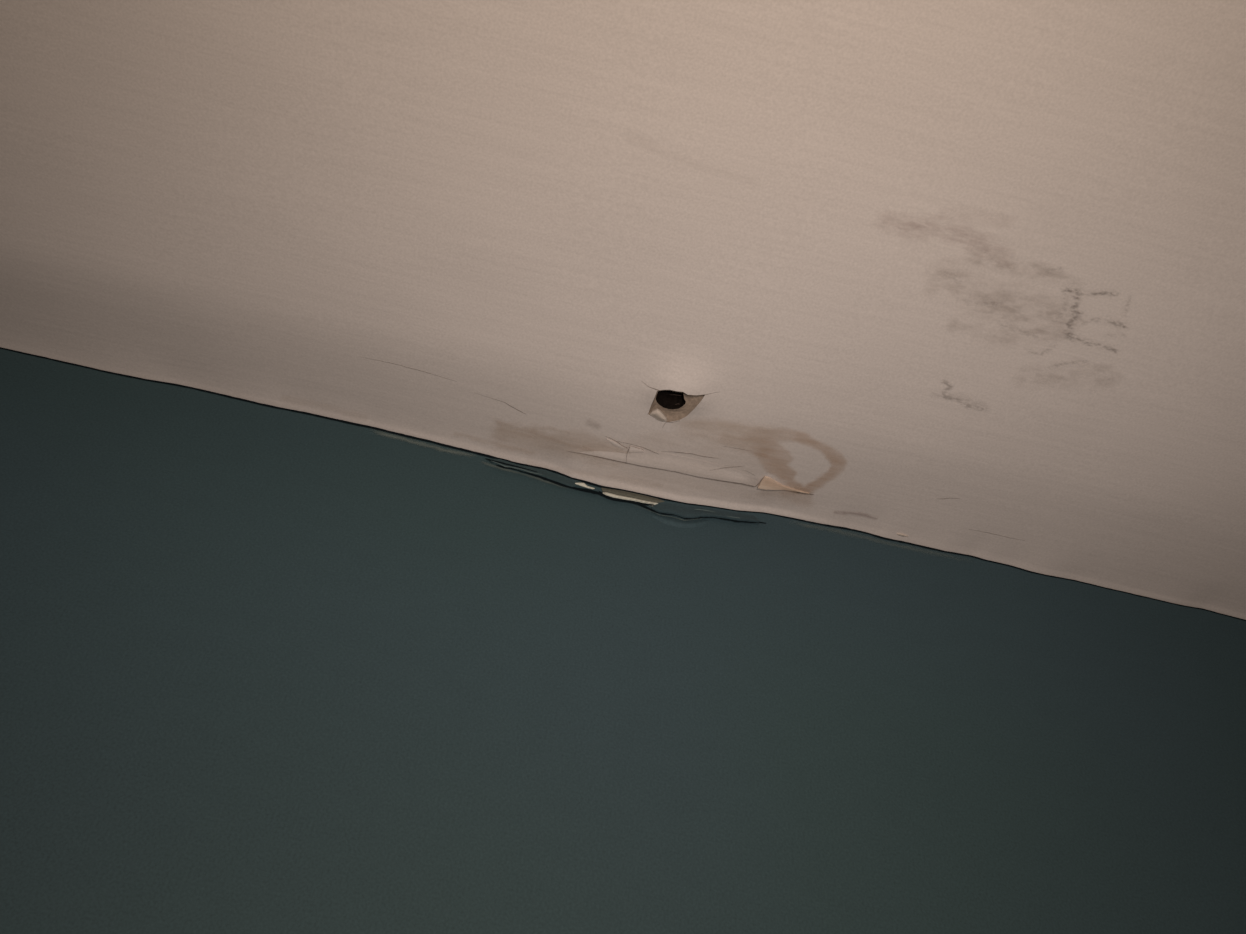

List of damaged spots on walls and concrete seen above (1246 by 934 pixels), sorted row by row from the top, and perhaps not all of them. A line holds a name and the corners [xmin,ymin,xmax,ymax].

hole [656,390,686,409]
peeling [485,458,764,525]